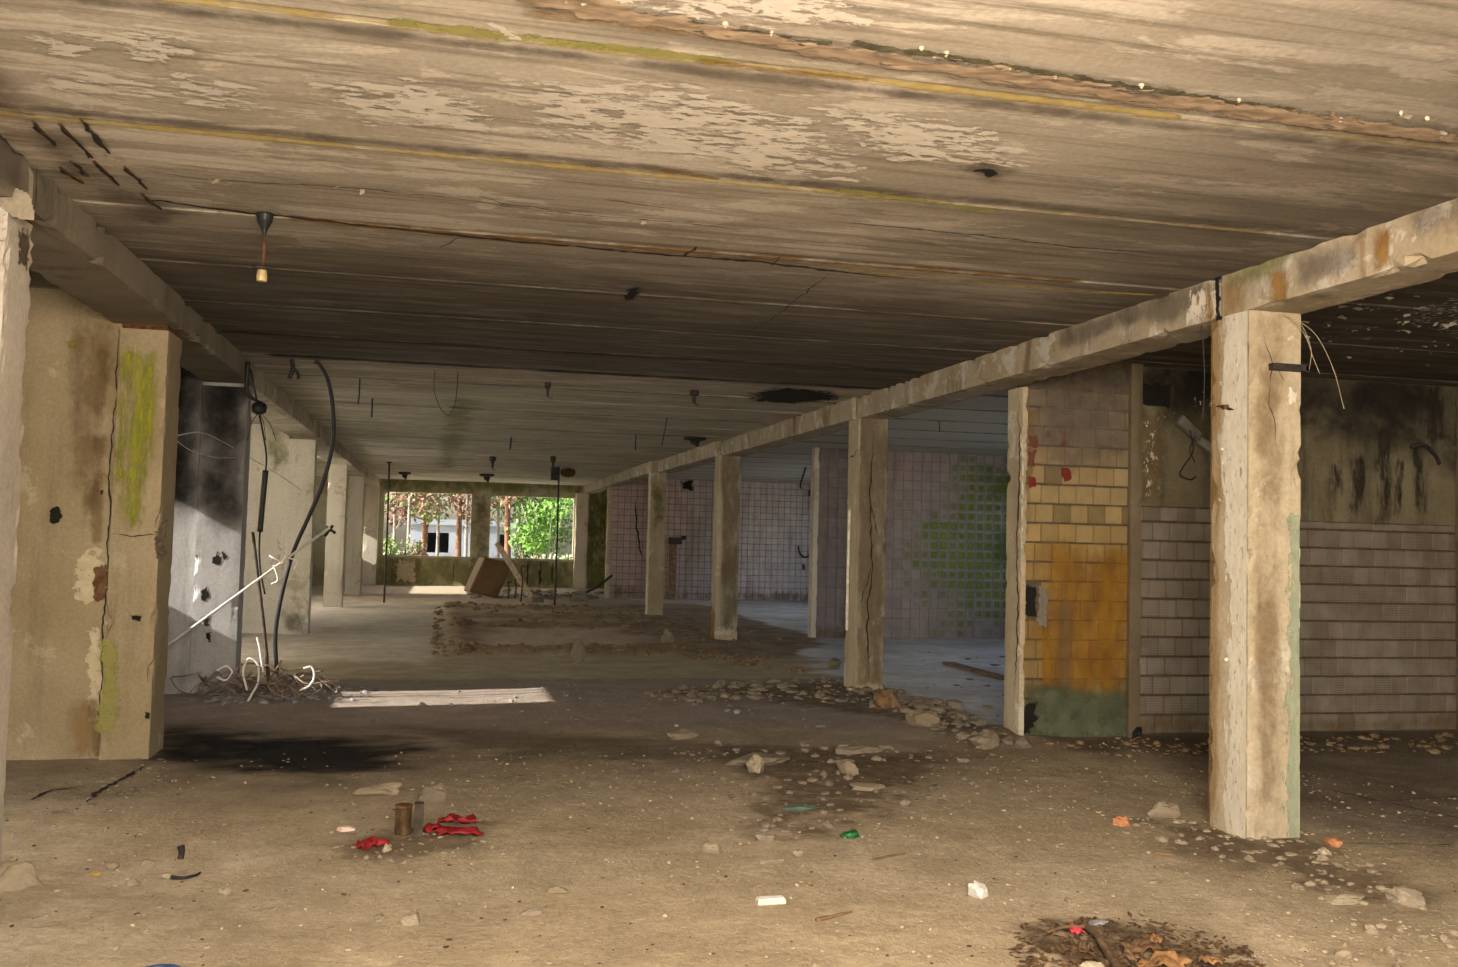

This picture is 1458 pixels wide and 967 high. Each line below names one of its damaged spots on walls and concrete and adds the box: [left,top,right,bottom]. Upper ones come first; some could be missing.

spalling [516,0,1458,143]
peeling [302,74,1038,186]
spalling [0,188,34,269]
corrosion [1375,230,1389,268]
leakage [1334,387,1443,520]
peeling [71,546,108,605]
crack [31,327,153,802]
peeling [85,620,108,722]